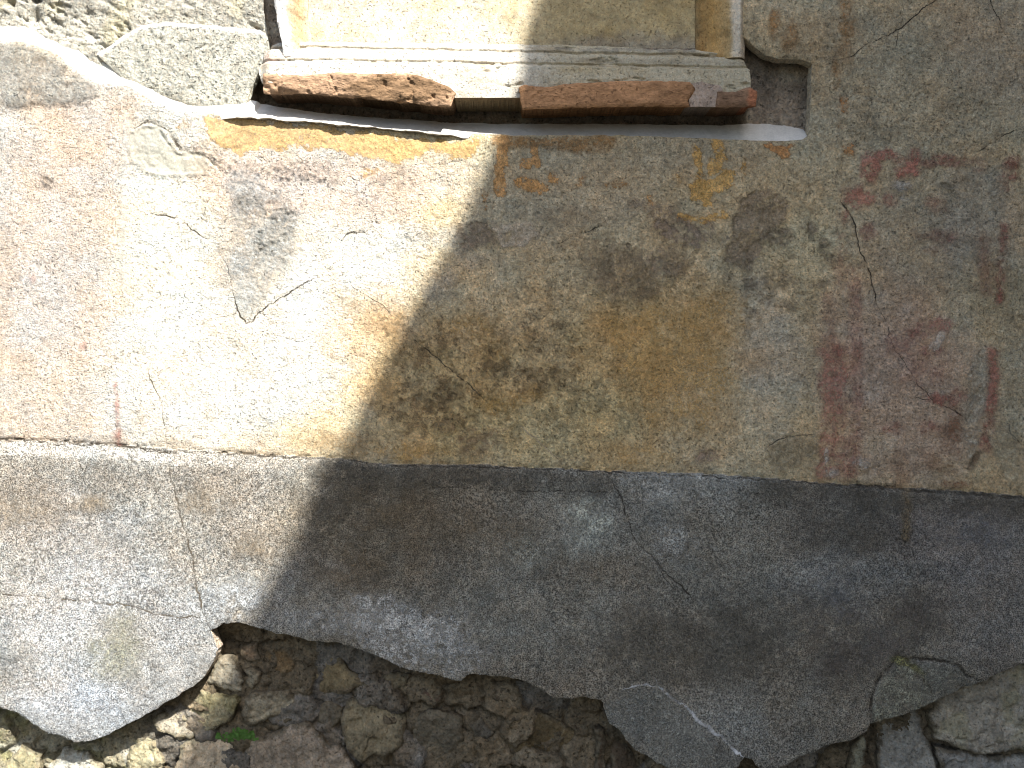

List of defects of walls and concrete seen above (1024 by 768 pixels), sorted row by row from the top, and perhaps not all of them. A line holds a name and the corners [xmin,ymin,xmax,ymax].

crack [826,0,936,60]
crack [155,214,207,239]
crack [227,265,318,324]
crack [841,202,963,417]
crack [0,370,367,628]
crack [393,425,1017,539]
crack [656,561,694,600]
flaking render [0,622,666,768]
crack [692,712,743,757]
flaking render [737,757,759,768]
flaking render [780,663,1024,768]